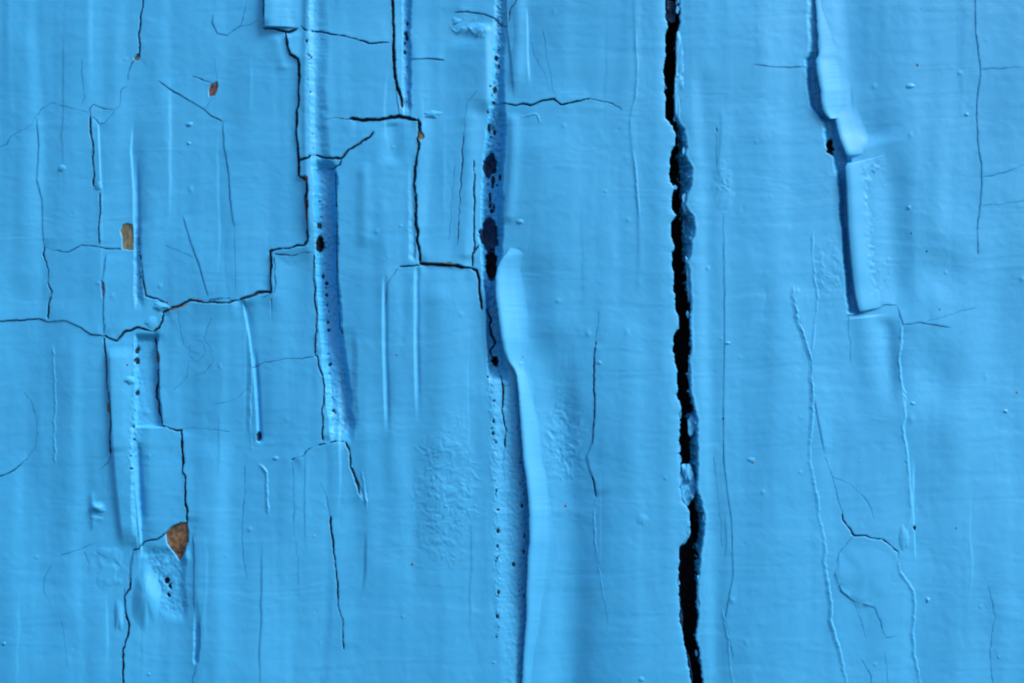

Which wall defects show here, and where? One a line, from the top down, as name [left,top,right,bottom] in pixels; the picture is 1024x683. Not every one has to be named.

hole [487,49,500,139]
hole [486,158,501,214]
crack [975,0,1024,255]
crack [0,0,513,683]
crack [846,304,975,362]
crack [825,458,898,683]